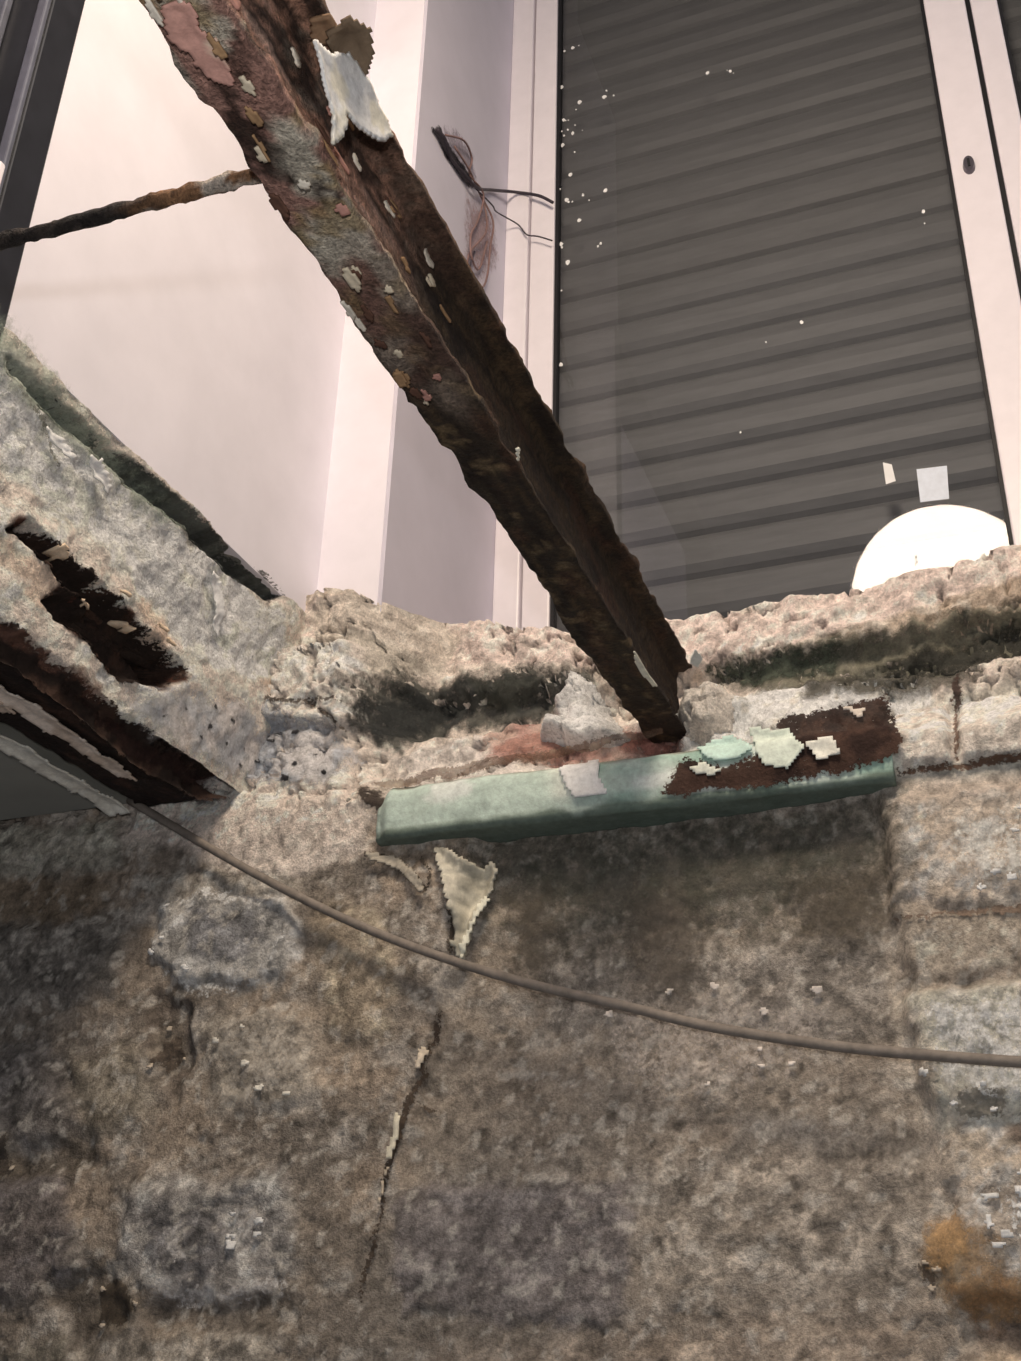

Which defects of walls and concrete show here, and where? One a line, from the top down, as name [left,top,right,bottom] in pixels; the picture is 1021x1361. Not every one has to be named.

peeling [145,0,271,163]
peeling [268,193,290,221]
peeling [0,522,364,784]
leakage [706,605,1021,699]
peeling [0,734,130,817]
rust [0,622,230,802]
leakage [336,662,600,755]
peeling [346,727,663,813]
rust [483,723,681,768]
peeling [661,693,903,799]
crack [358,1010,443,1302]
rust [926,1214,1021,1322]